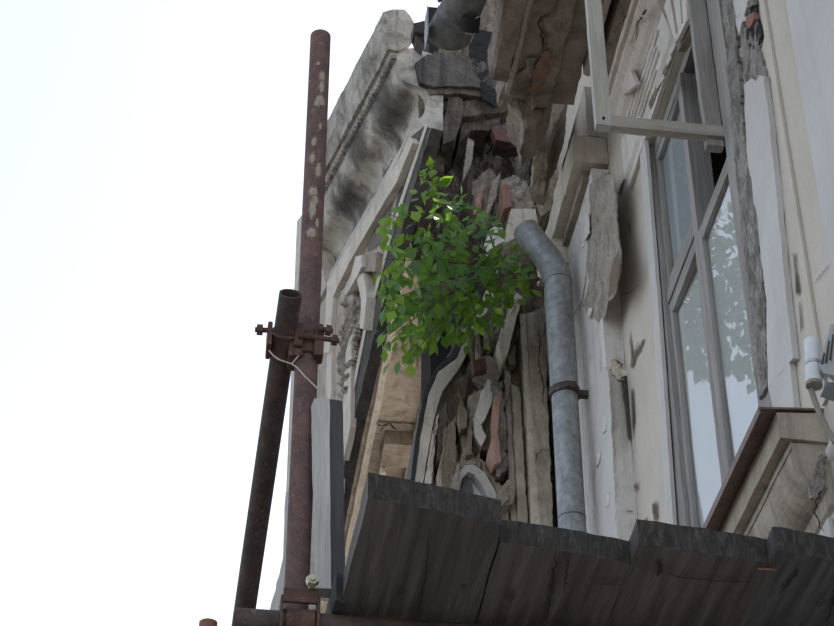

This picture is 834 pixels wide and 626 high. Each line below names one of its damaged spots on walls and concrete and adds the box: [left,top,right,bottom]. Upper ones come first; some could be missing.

crack [537,15,548,50]
spalling [739,0,768,84]
damp [369,83,410,151]
spalling [487,123,518,160]
damp [331,181,375,229]
spalling [462,138,536,235]
spalling [485,381,509,484]